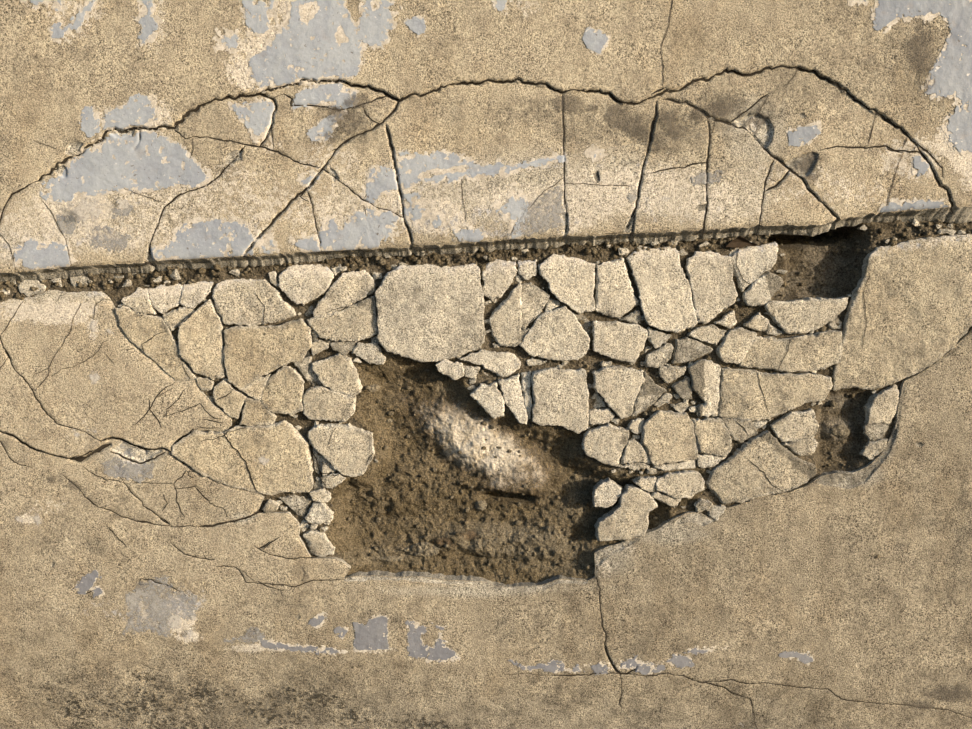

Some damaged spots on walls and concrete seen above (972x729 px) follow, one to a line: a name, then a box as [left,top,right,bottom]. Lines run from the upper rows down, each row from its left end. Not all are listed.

peeling [11,93,214,270]
peeling [212,0,429,143]
peeling [146,148,569,261]
crack [0,0,953,284]
spalling [767,223,872,301]
crack [862,272,870,348]
peeling [848,0,972,155]
peeling [877,193,951,213]
crack [0,299,342,596]
spalling [325,354,714,592]
spalling [814,387,897,489]
crack [508,578,972,728]